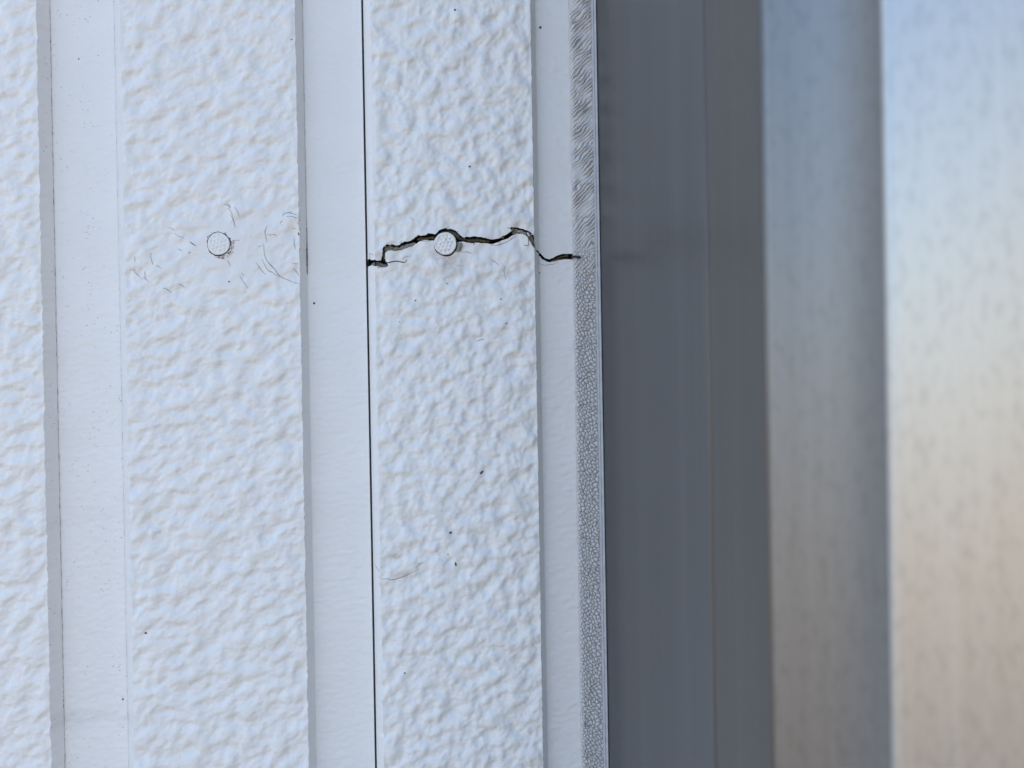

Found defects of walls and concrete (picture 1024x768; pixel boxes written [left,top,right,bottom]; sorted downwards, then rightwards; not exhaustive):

crack [367,217,604,768]